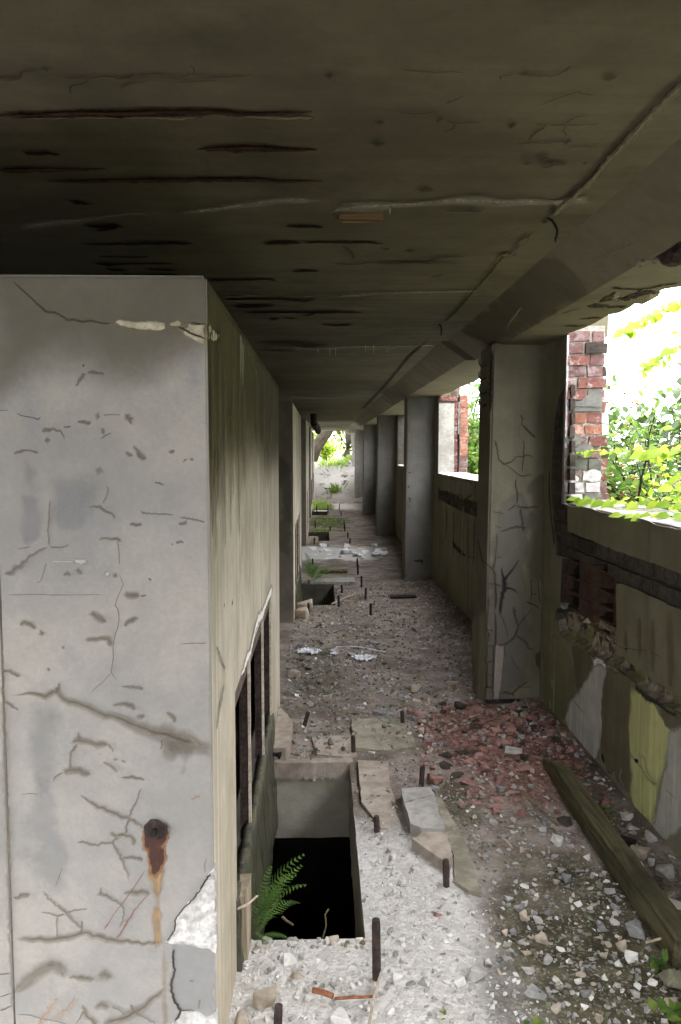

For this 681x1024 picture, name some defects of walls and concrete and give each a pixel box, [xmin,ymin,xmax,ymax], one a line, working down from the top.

crack [17,285,109,324]
spalling [116,320,220,348]
spalling [587,290,661,308]
flaking render [554,385,681,608]
crack [453,415,555,698]
crack [0,487,211,1024]
rust [104,831,169,938]
rust [153,908,161,944]
spalling [166,866,216,946]
spalling [173,1011,217,1024]